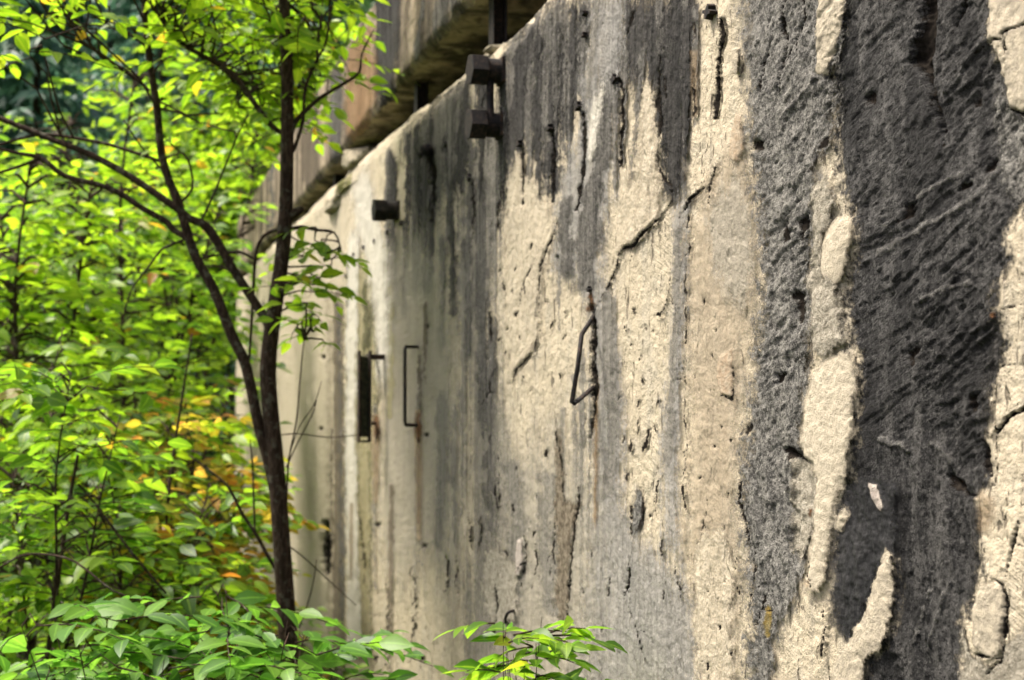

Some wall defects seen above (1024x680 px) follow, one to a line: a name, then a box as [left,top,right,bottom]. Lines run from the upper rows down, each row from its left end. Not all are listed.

water stain [276,0,755,680]
crack [599,152,720,544]
water stain [980,316,1004,437]
crack [991,408,1024,486]
water stain [261,529,277,612]
water stain [826,476,899,644]
water stain [969,502,981,604]